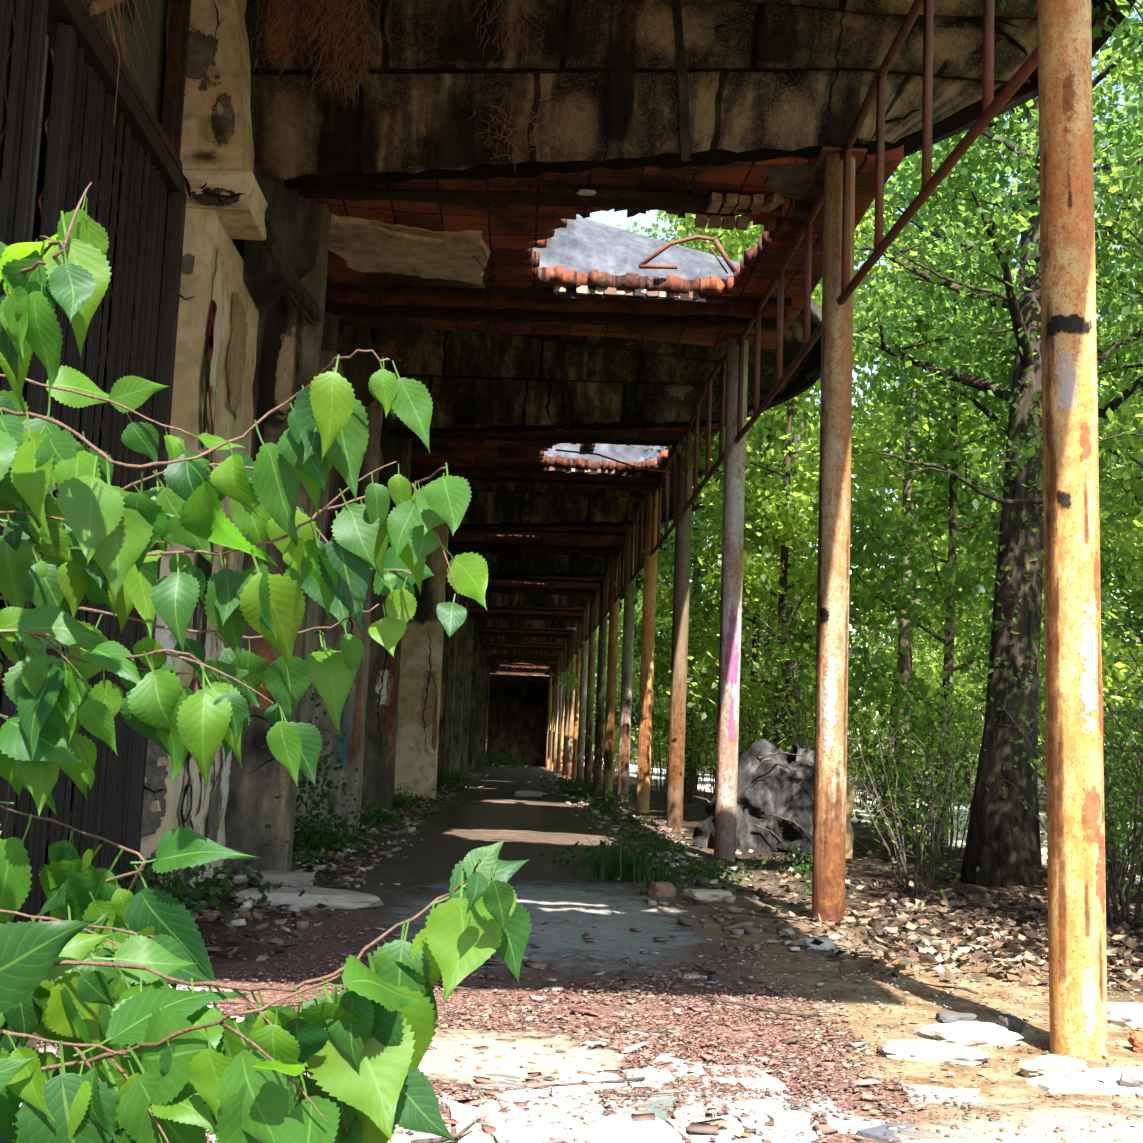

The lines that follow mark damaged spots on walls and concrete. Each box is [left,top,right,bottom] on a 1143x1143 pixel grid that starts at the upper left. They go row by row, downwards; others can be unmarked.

leakage [194,152,216,162]
leakage [438,0,504,62]
leakage [556,10,711,149]
crack [824,0,852,131]
leakage [820,94,876,145]
peeling [1056,351,1078,411]
corrosion [1084,481,1100,611]
corrosion [716,563,724,799]
corrosion [814,477,848,914]
corrosion [1044,302,1067,981]
peeling [1079,597,1099,732]
corrosion [1082,780,1106,1002]